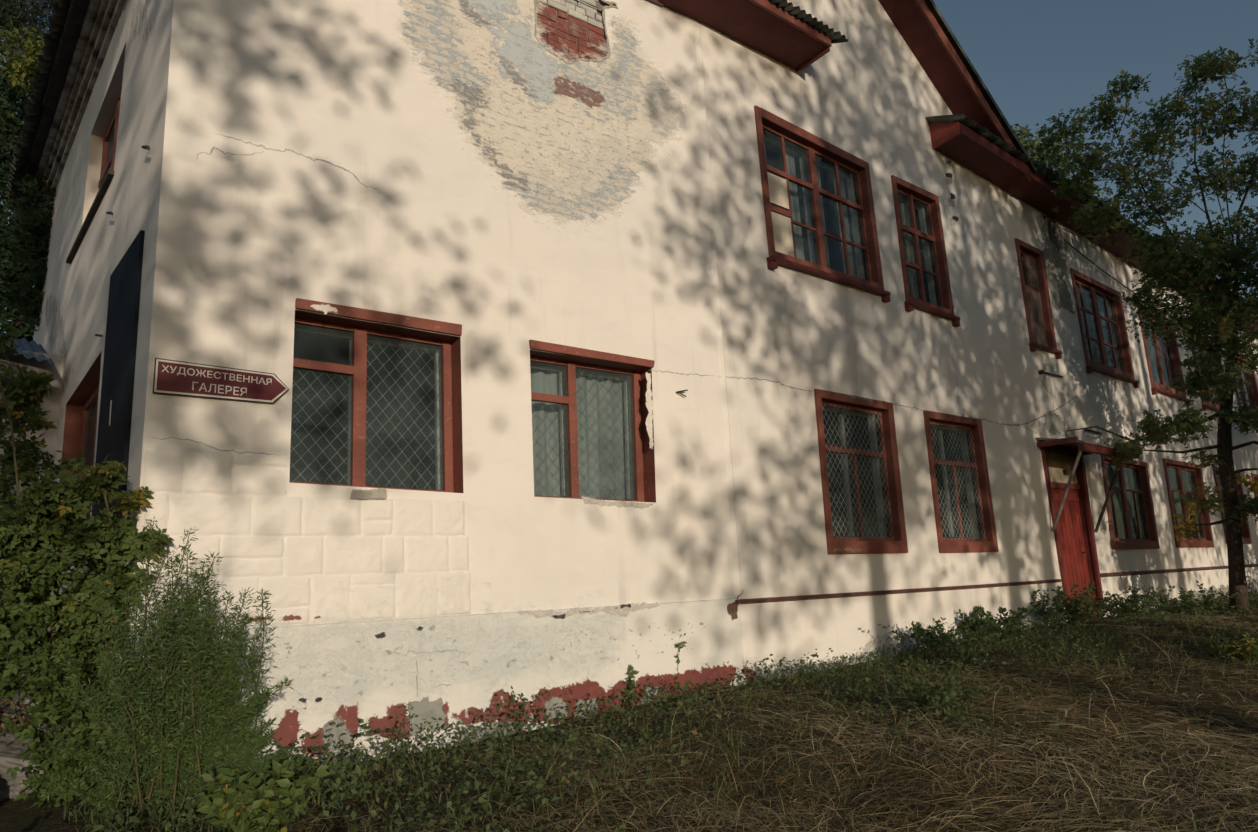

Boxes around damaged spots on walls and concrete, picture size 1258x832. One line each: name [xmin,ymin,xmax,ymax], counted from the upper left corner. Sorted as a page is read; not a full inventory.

peeling [400,0,682,222]
spalling [1041,213,1075,314]
peeling [645,372,655,449]
peeling [263,625,844,757]